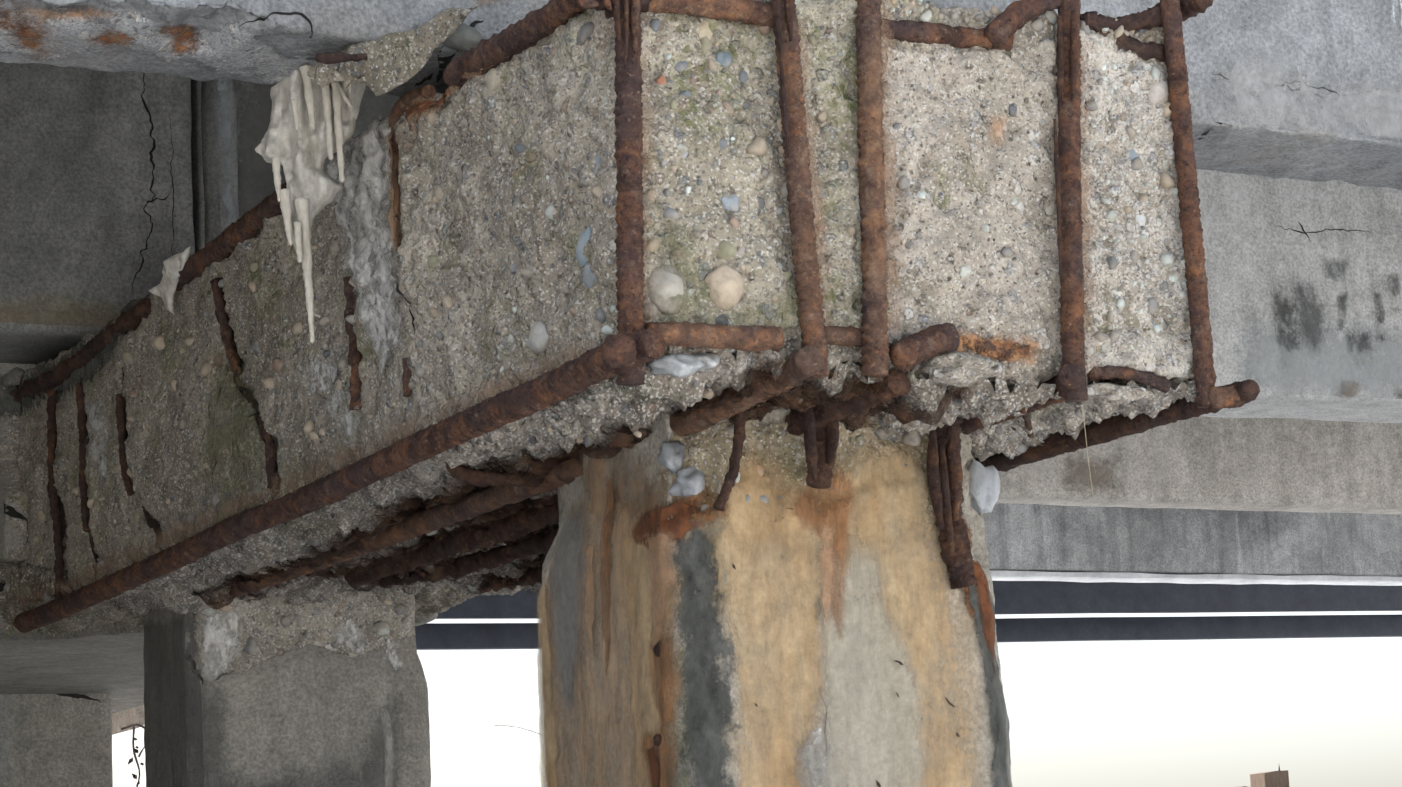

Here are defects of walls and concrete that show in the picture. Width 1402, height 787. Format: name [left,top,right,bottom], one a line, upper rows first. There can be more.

crack [132,73,174,298]
spalling [0,8,318,84]
corrosion [576,0,640,74]
spalling [73,0,1196,674]
corrosion [1053,10,1088,276]
crack [1271,220,1369,243]
leakage [1250,277,1402,392]
spalling [0,469,74,626]
corrosion [193,424,652,610]
corrosion [632,493,727,787]
leakage [538,453,1012,787]
corrosion [670,353,995,669]